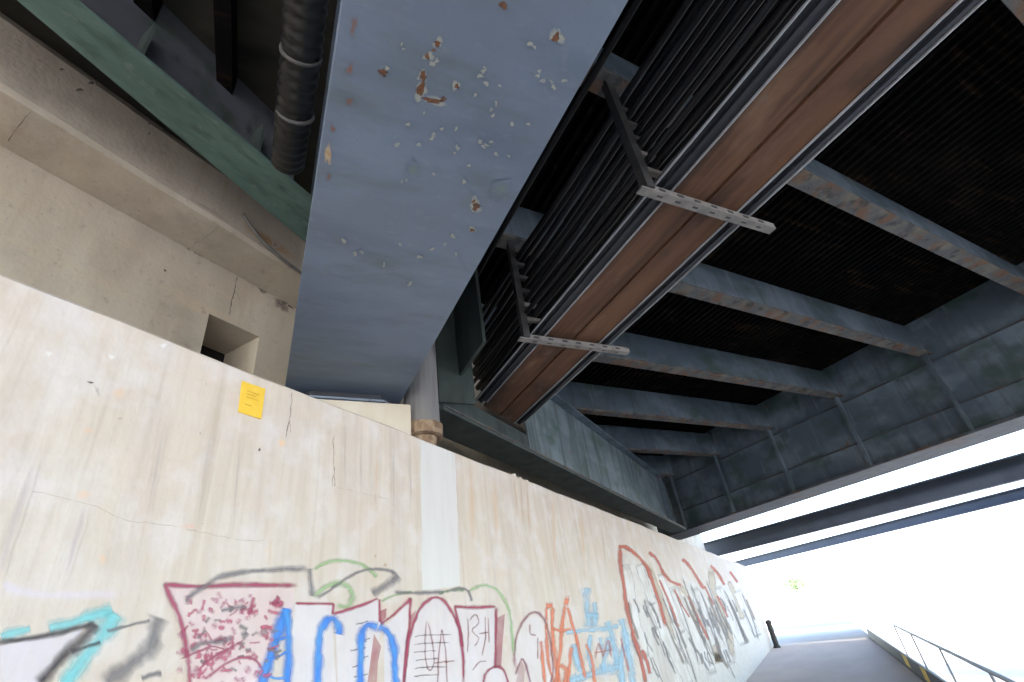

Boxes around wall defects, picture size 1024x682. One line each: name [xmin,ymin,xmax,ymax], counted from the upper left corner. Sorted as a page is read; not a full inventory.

corrosion [413,34,462,108]
crack [229,277,240,315]
crack [285,392,293,437]